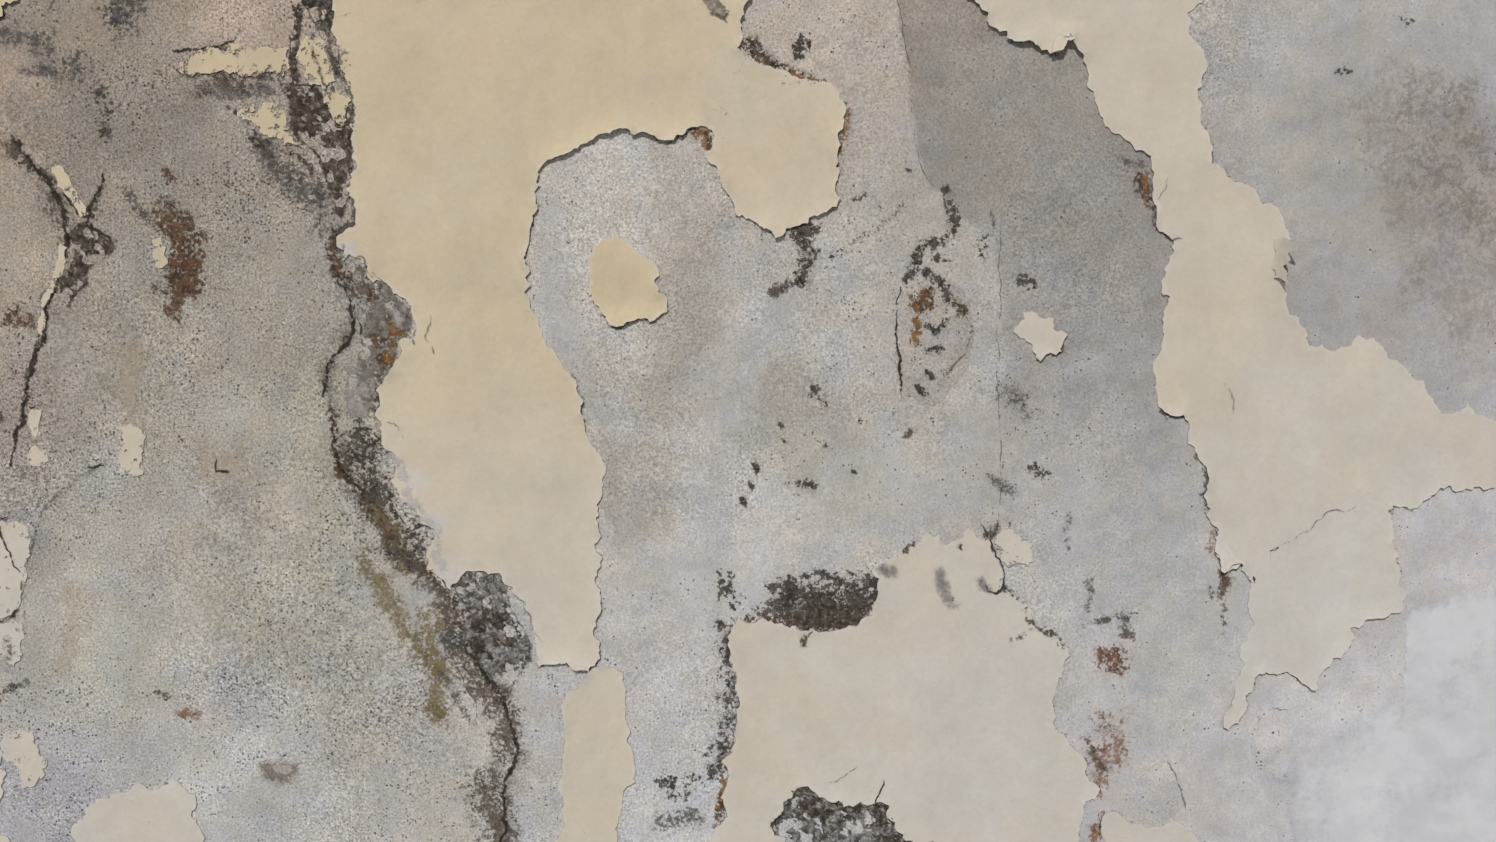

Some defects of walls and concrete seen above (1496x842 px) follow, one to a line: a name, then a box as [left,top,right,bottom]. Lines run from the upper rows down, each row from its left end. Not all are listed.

crack [9,139,110,466]
rust [122,167,208,324]
crack [320,280,388,518]
peeling [178,0,846,842]
rust [908,286,936,347]
peeling [975,0,1496,730]
peeling [0,520,31,667]
peeling [0,727,48,799]
crack [463,644,519,842]
peeling [706,528,1100,842]
rust [1085,710,1129,842]
rust [1097,644,1130,675]